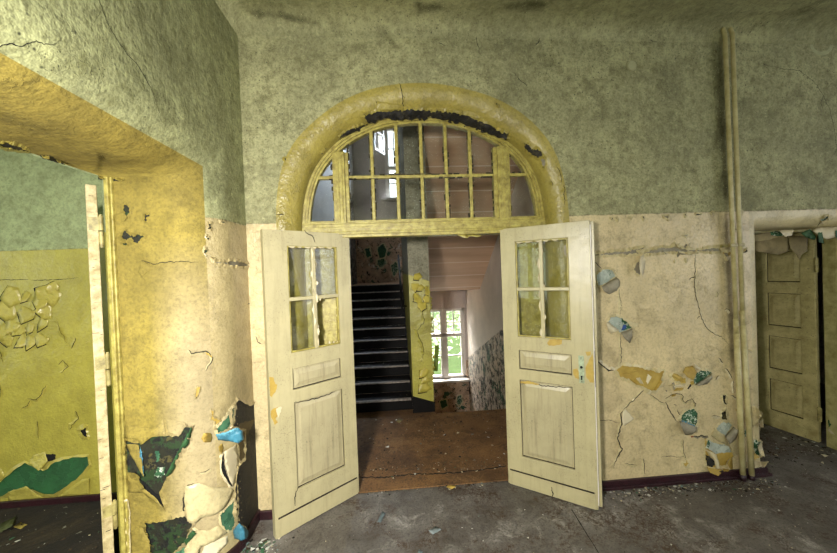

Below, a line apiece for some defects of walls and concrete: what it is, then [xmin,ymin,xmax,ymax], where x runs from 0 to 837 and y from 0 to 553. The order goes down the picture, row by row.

crack [0,39,53,47]
crack [81,0,162,123]
flaking render [338,101,510,141]
peeling [595,234,731,294]
crack [690,254,736,400]
crack [598,334,622,372]
peeling [613,362,713,397]
crack [622,390,696,420]
peeling [0,452,92,501]
peeling [122,405,248,553]
crack [625,435,708,475]
peeling [678,393,769,476]